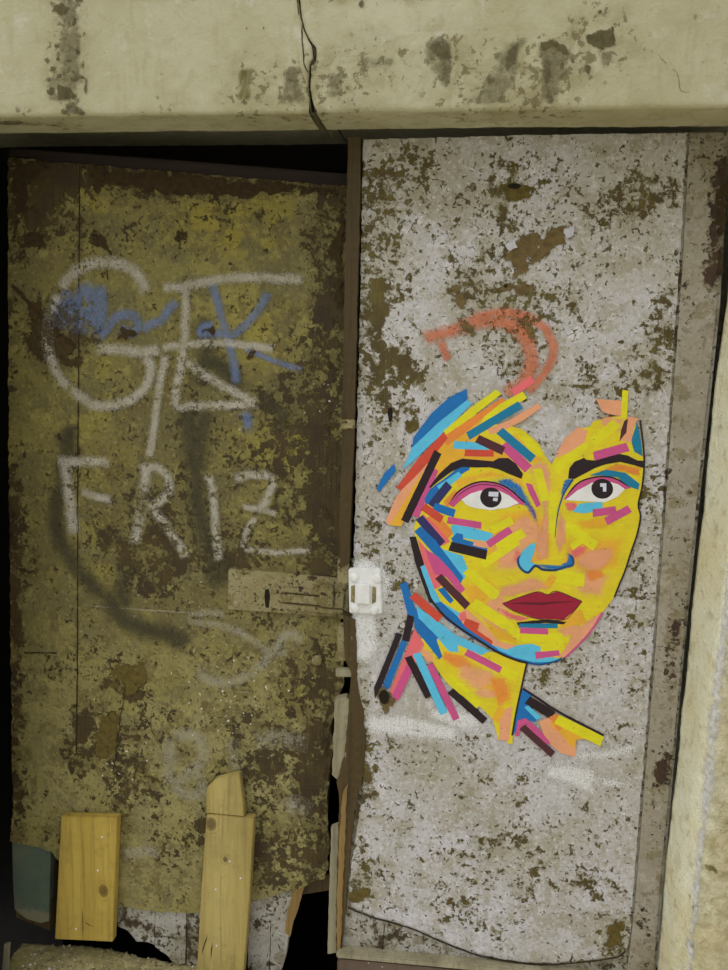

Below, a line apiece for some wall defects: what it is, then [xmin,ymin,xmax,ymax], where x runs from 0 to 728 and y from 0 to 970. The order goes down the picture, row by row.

spalling [44,0,88,100]
crack [297,0,317,113]
spalling [580,10,616,65]